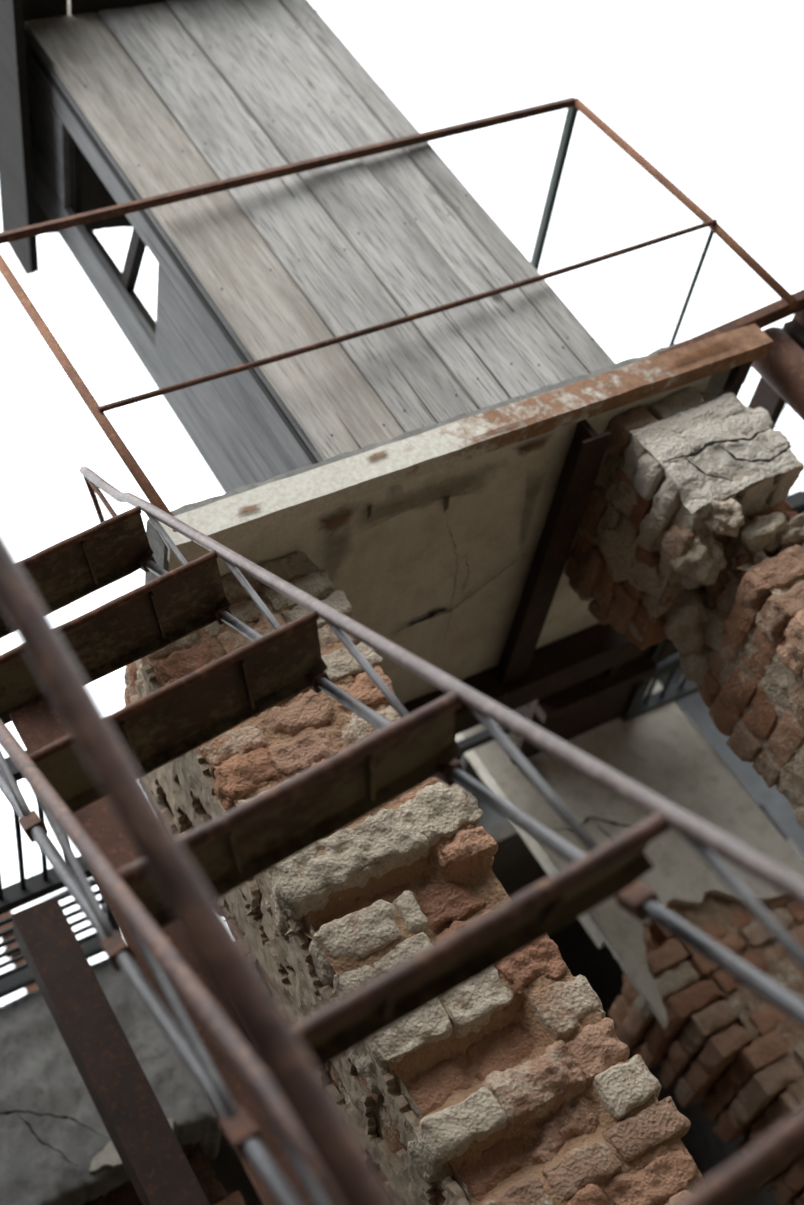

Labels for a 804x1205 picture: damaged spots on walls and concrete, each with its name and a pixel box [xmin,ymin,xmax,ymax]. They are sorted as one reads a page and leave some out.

crack [390,505,525,642]
crack [0,1110,106,1166]